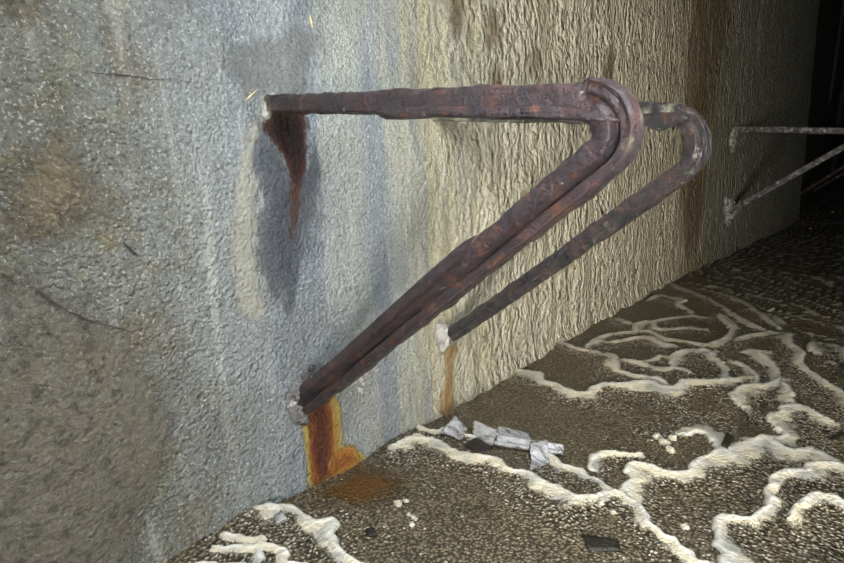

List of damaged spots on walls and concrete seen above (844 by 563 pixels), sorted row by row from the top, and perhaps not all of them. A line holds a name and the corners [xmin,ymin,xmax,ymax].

rust [376,106,620,123]
rust [643,111,692,131]
rust [263,113,310,237]
rust [299,235,479,394]
rust [440,346,458,416]
rust [301,395,366,488]